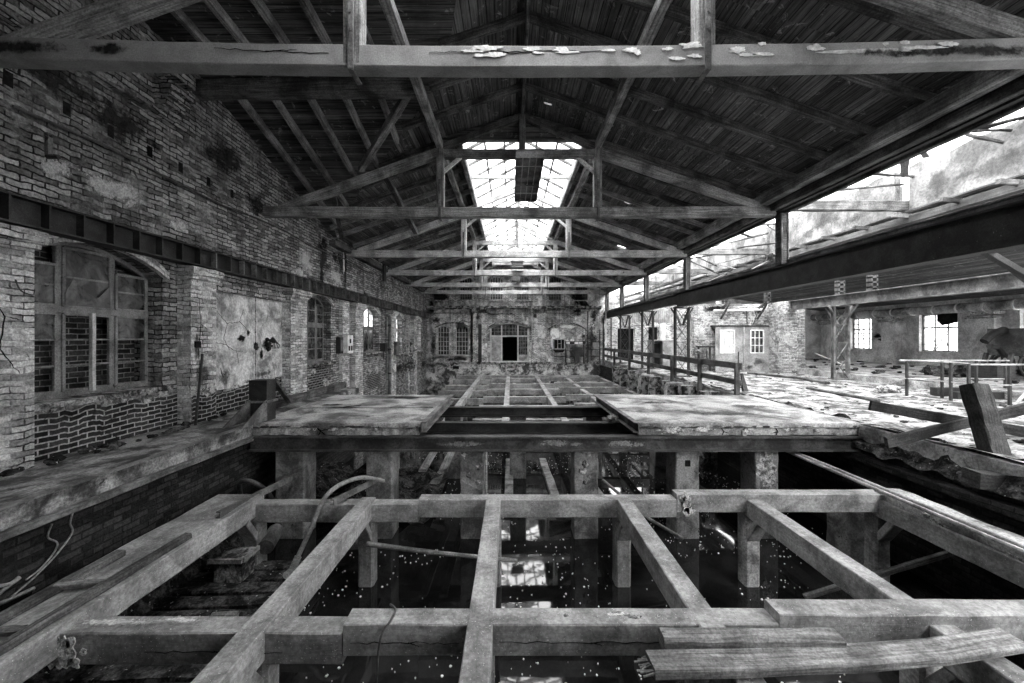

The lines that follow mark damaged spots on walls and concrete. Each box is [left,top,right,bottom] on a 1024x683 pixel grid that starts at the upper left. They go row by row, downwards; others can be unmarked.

leakage [0,19,59,53]
leakage [91,43,125,54]
crack [222,47,322,55]
peeling [461,45,506,58]
peeling [806,40,959,54]
leakage [864,44,1024,57]
leakage [245,192,263,216]
crack [0,309,24,373]
crack [198,301,251,376]
spalling [659,378,1024,537]
spalling [890,529,1024,600]
crack [513,639,659,647]